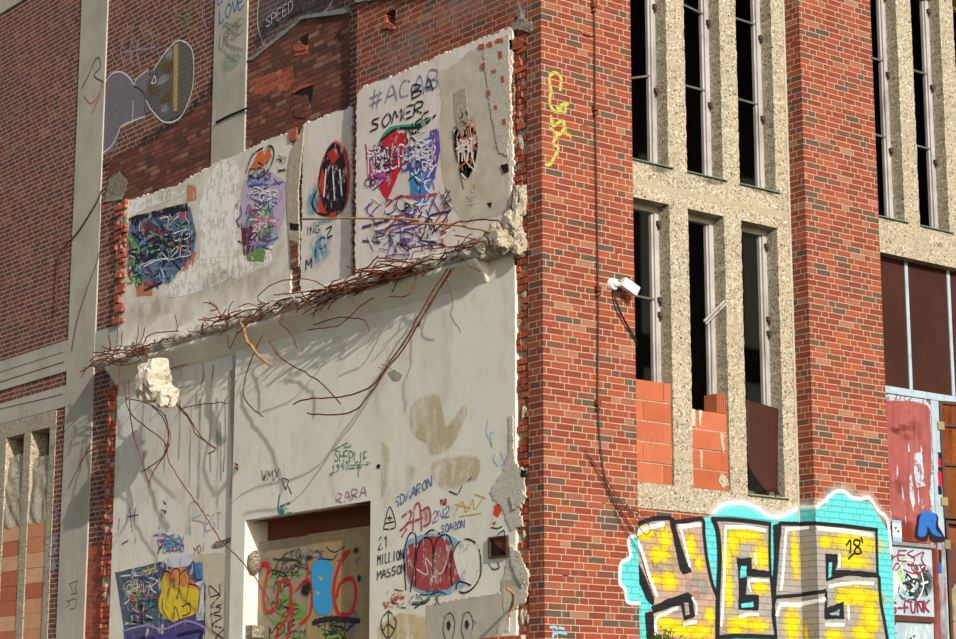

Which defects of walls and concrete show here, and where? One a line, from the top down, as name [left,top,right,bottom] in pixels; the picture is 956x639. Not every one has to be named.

flaking render [83,13,535,639]
damp [416,396,459,454]
damp [440,457,480,487]
peeling [886,394,935,521]